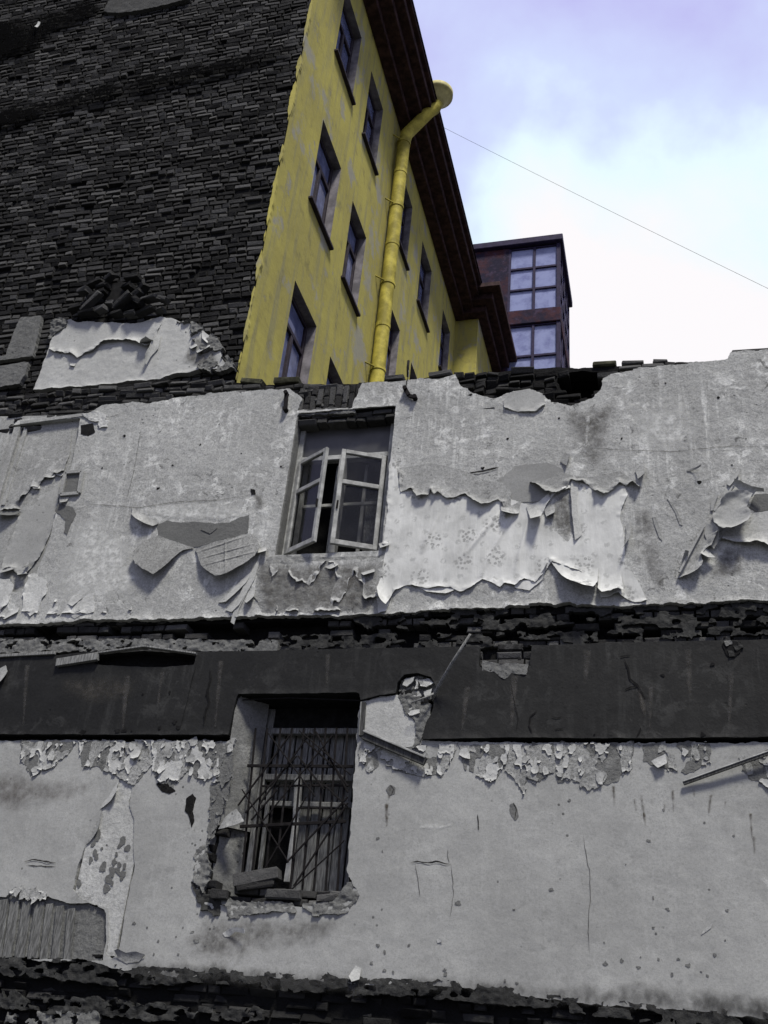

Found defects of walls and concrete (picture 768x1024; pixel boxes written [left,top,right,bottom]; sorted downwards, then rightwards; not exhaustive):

spalling [48,317,68,341]
spalling [454,366,600,409]
peeling [0,411,109,619]
peeling [399,463,521,517]
peeling [530,453,645,517]
spalling [0,504,768,681]
spalling [358,676,711,794]
spalling [20,736,359,937]
crack [414,854,454,915]